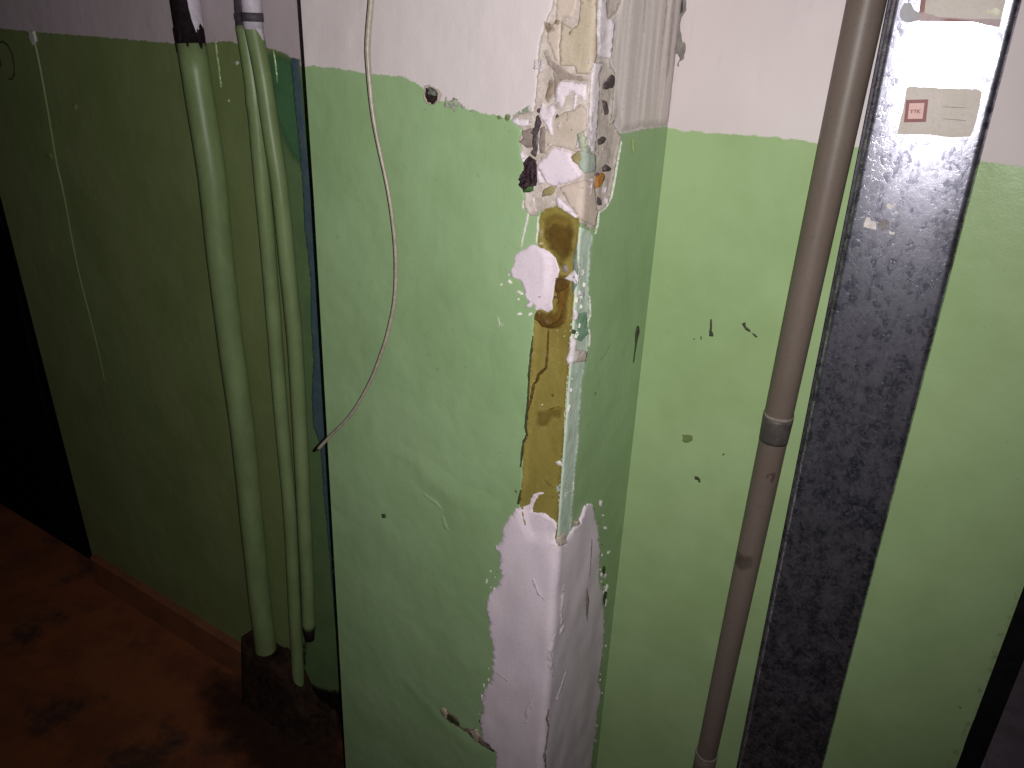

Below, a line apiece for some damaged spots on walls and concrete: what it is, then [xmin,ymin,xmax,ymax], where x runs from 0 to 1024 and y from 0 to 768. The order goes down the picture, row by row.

spalling [424,85,473,112]
flaking render [497,0,623,546]
crack [528,330,549,409]